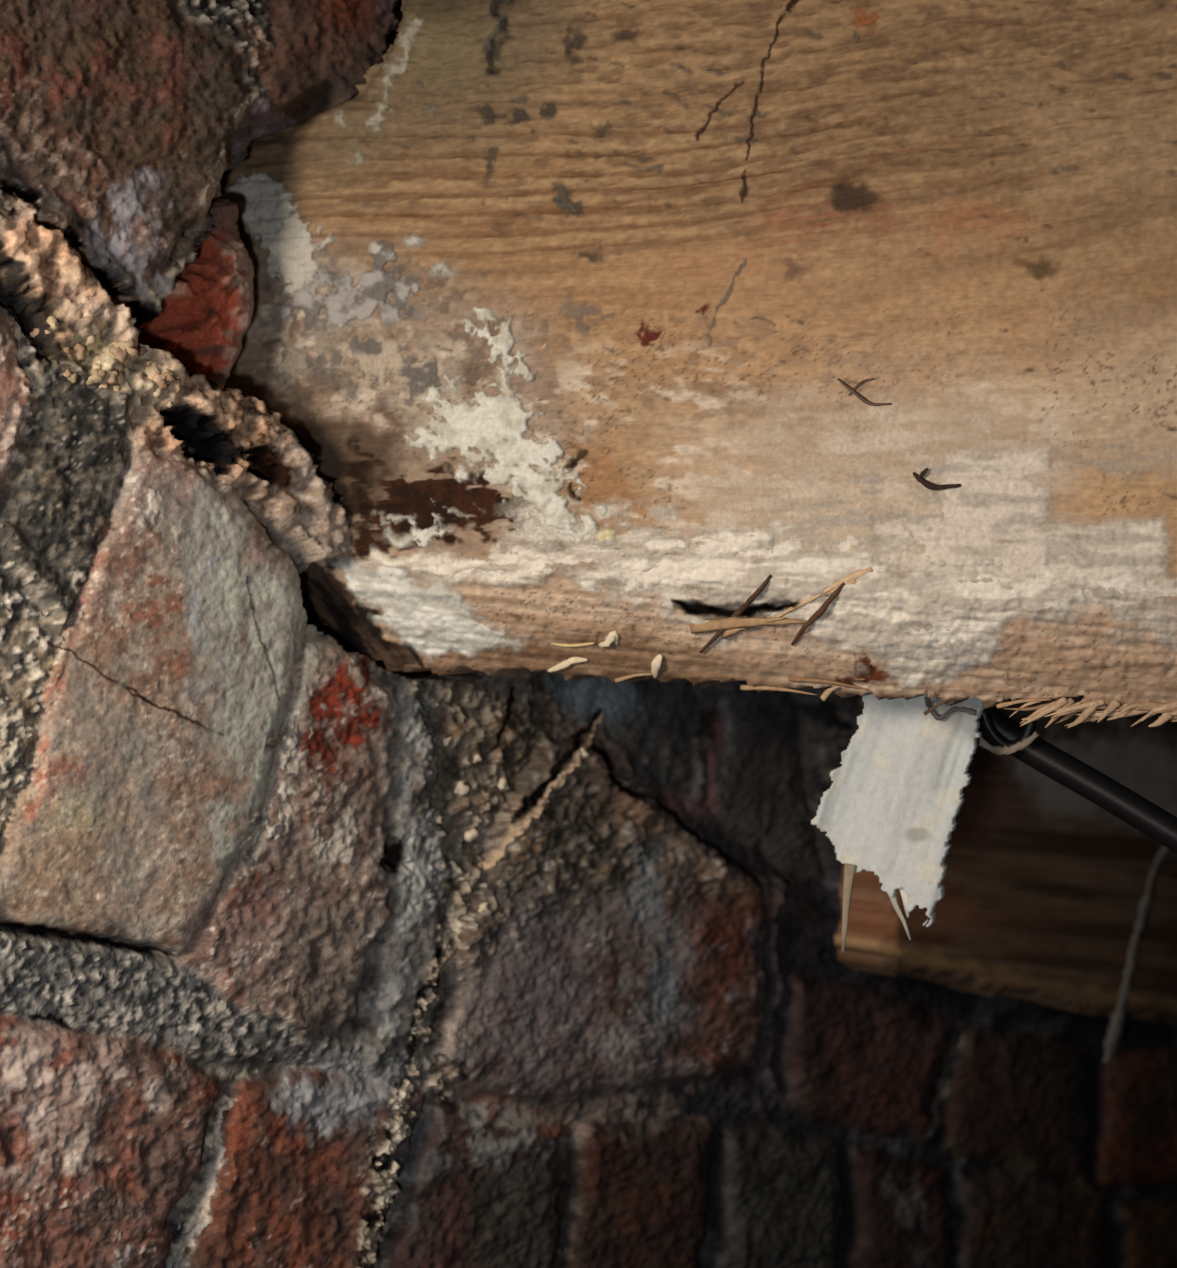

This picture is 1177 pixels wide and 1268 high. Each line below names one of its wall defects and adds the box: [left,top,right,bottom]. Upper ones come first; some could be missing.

damp [230,91,260,130]
damp [363,18,423,133]
crack [0,179,159,334]
crack [179,361,341,505]
damp [173,143,1177,689]
crack [247,576,279,699]
crack [485,687,515,753]
crack [514,709,601,819]
peeling [811,694,985,952]
crack [0,923,175,957]
crack [28,1015,71,1030]